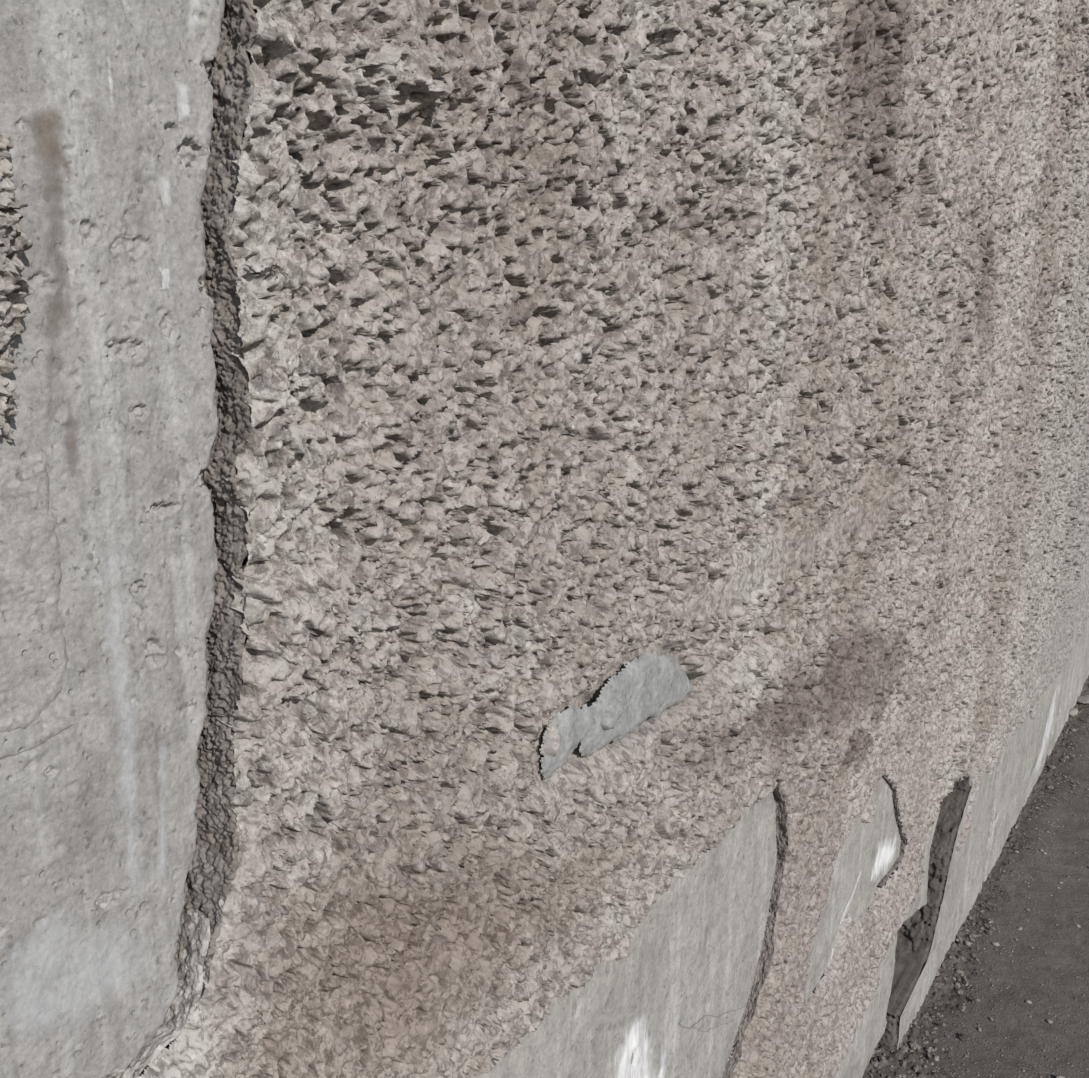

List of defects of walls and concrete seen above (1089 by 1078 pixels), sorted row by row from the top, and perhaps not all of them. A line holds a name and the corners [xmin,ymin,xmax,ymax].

spalling [79,217,94,239]
spalling [177,0,259,989]
crack [0,724,73,759]
spalling [145,641,166,669]
spalling [540,651,693,780]
spalling [175,951,186,980]
spalling [470,781,788,1078]
spalling [803,775,906,1002]
spalling [833,935,897,1078]
spalling [903,808,941,922]